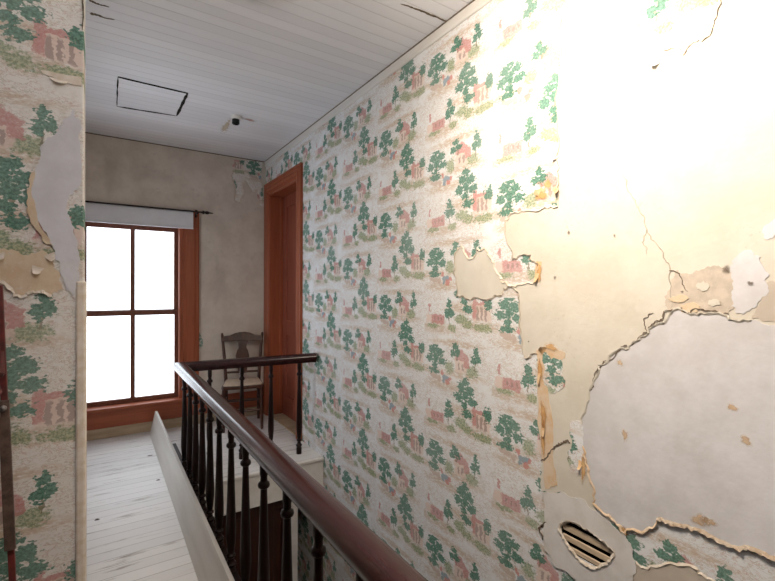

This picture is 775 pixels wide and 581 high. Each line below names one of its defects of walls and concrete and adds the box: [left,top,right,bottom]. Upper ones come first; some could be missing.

spalling [26,109,82,295]
crack [591,176,728,390]
spalling [542,250,775,581]